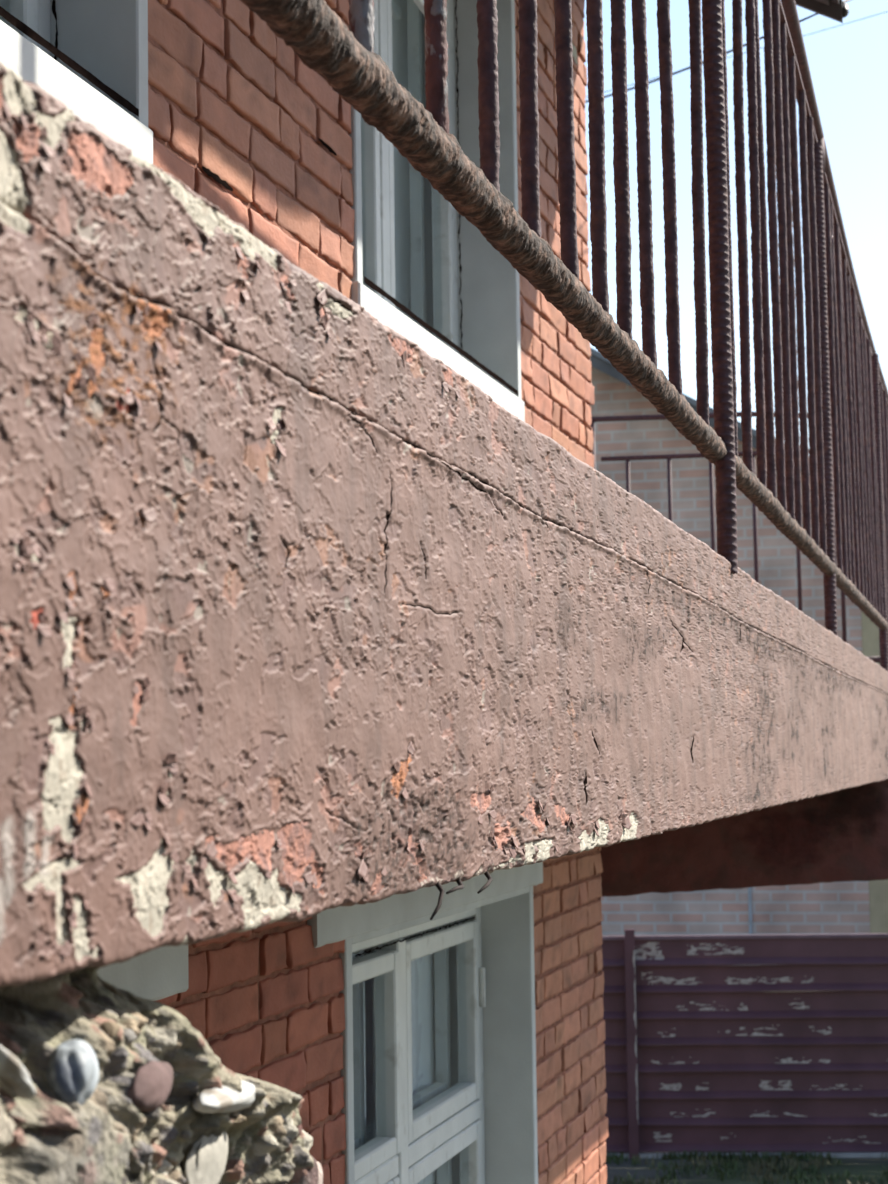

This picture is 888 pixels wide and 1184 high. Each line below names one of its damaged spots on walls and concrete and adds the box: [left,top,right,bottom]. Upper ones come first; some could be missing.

crack [453,0,461,146]
peeling [0,62,297,314]
peeling [11,303,107,410]
peeling [135,299,171,354]
peeling [316,283,354,340]
crack [364,214,519,396]
crack [101,278,886,694]
peeling [22,571,99,961]
peeling [157,752,178,808]
peeling [115,808,324,937]
spalling [399,783,639,920]
peeling [633,942,702,1119]